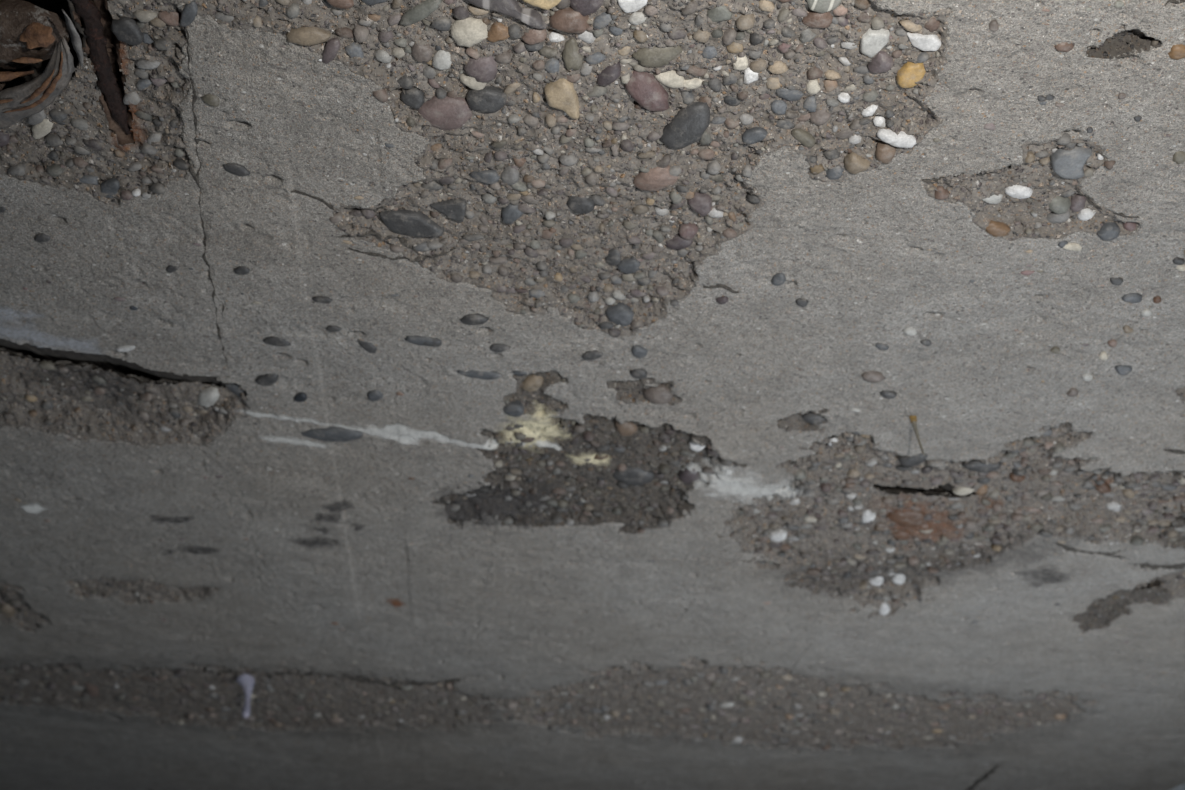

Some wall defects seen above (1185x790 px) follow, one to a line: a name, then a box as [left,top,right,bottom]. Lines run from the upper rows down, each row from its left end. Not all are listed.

rust [0,51,63,113]
crack [0,26,242,390]
spalling [0,0,952,338]
spalling [924,133,1140,248]
spalling [0,351,249,447]
spalling [503,370,568,418]
spalling [606,368,682,405]
spalling [719,409,1185,617]
spalling [1072,566,1185,632]
spalling [0,660,496,736]
crack [967,762,1003,790]